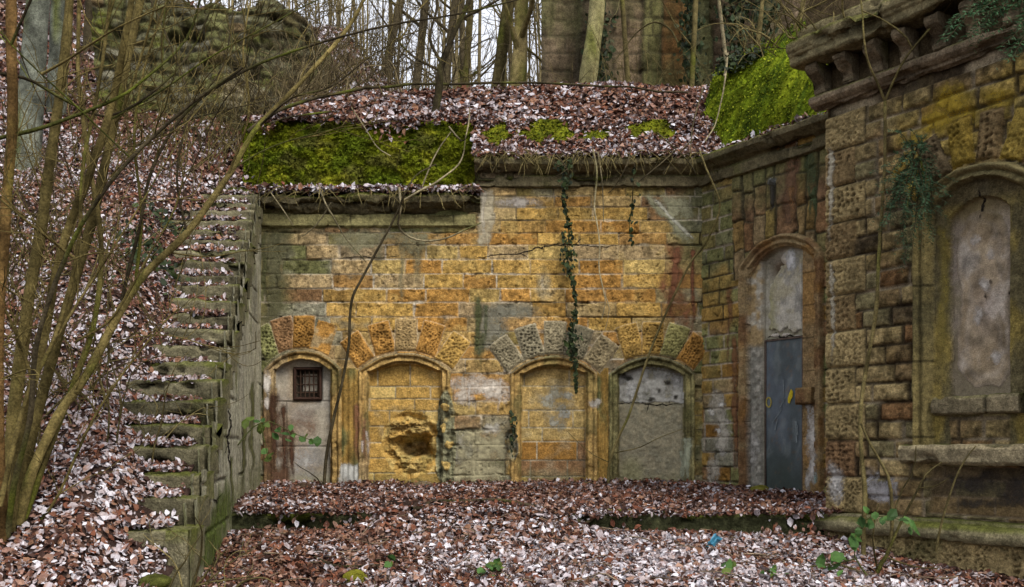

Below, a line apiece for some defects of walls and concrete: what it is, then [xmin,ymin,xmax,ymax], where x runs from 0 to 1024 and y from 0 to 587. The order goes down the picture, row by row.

corrosion [659,246,696,328]
flaking render [768,251,803,338]
flaking render [381,389,519,485]
crack [618,401,678,412]